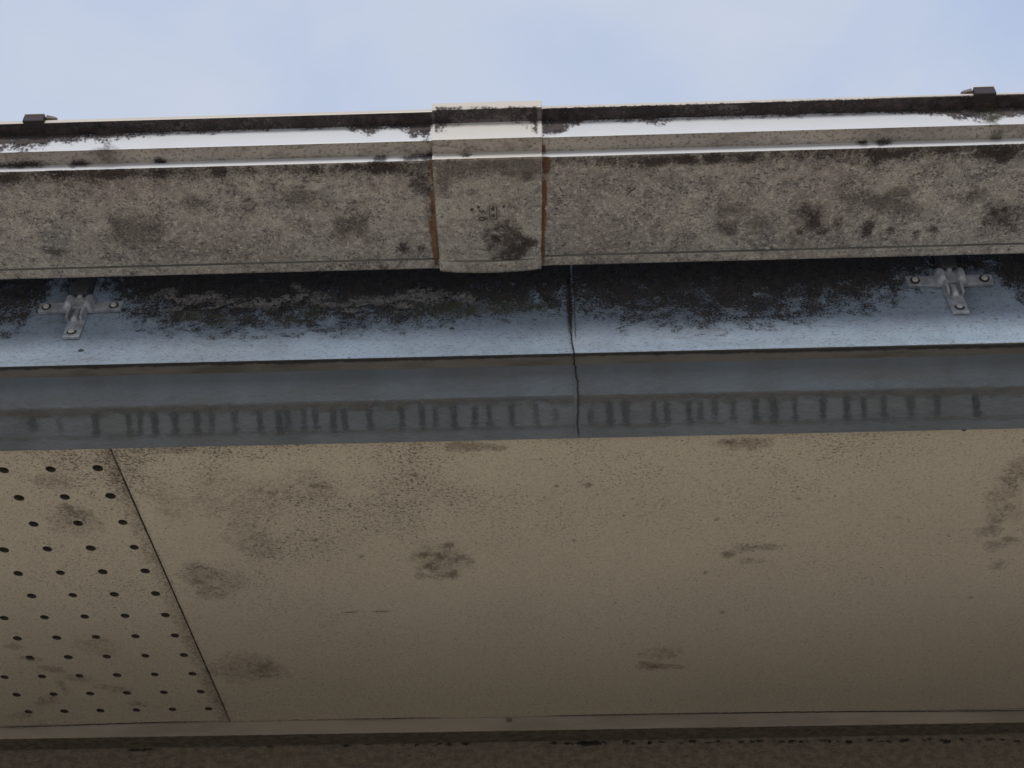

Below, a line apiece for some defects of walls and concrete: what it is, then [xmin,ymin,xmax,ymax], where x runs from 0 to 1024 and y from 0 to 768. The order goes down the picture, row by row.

damp [0,94,1024,213]
corrosion [428,160,438,266]
corrosion [542,156,551,263]
damp [791,204,843,244]
damp [861,213,895,239]
damp [0,278,77,339]
damp [96,220,937,340]
crack [568,265,579,436]
damp [954,253,1024,306]